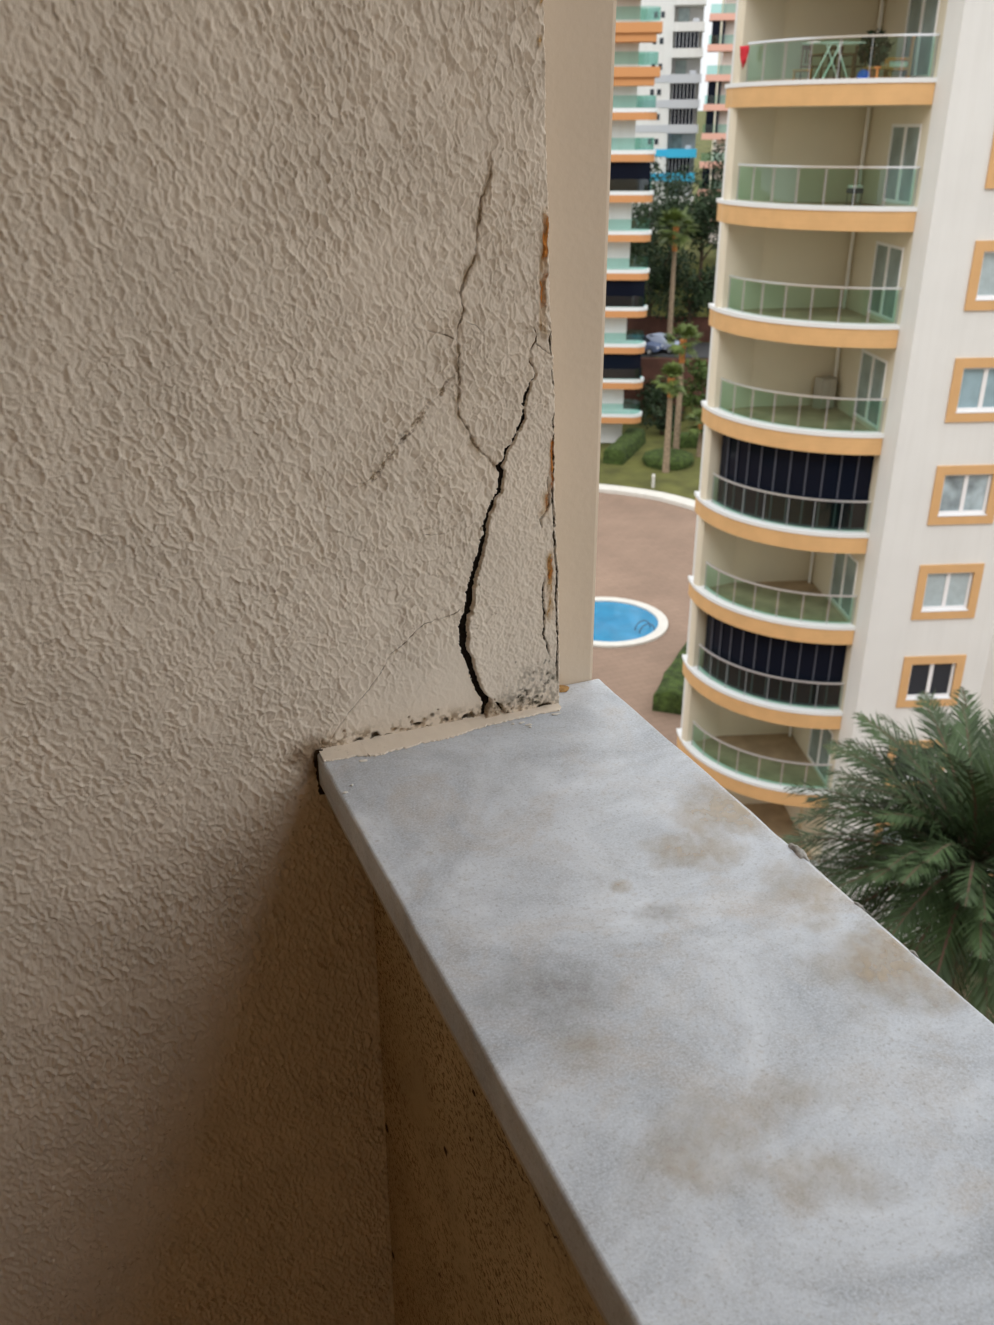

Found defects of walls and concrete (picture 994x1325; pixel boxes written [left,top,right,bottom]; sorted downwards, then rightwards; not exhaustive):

crack [348,194,559,714]